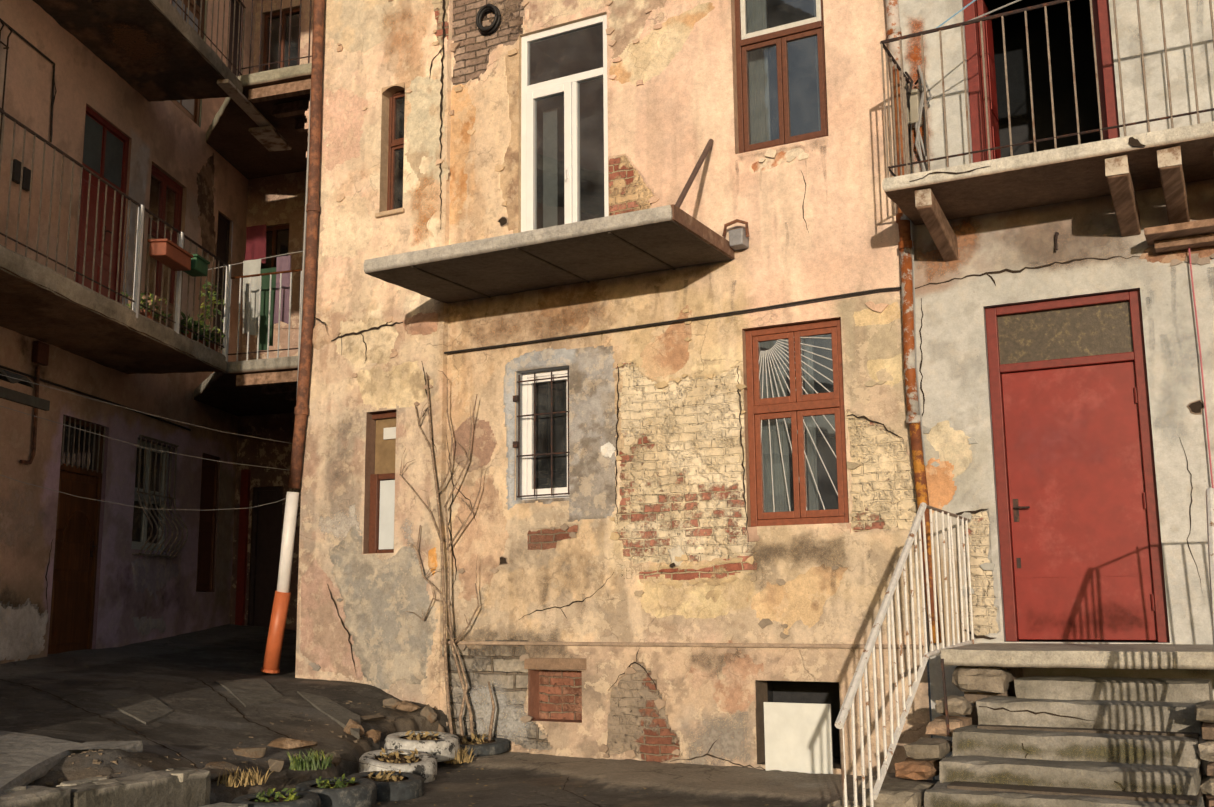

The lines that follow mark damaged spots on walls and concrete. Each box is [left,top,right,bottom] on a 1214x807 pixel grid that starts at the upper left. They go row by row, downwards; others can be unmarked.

flaking render [324,0,398,54]
spalling [404,0,715,233]
spalling [751,148,809,173]
crack [314,317,403,361]
crack [915,256,1140,416]
spalling [609,305,848,639]
crack [847,414,902,438]
flaking render [923,420,977,480]
crack [519,572,614,620]
spalling [599,663,681,763]